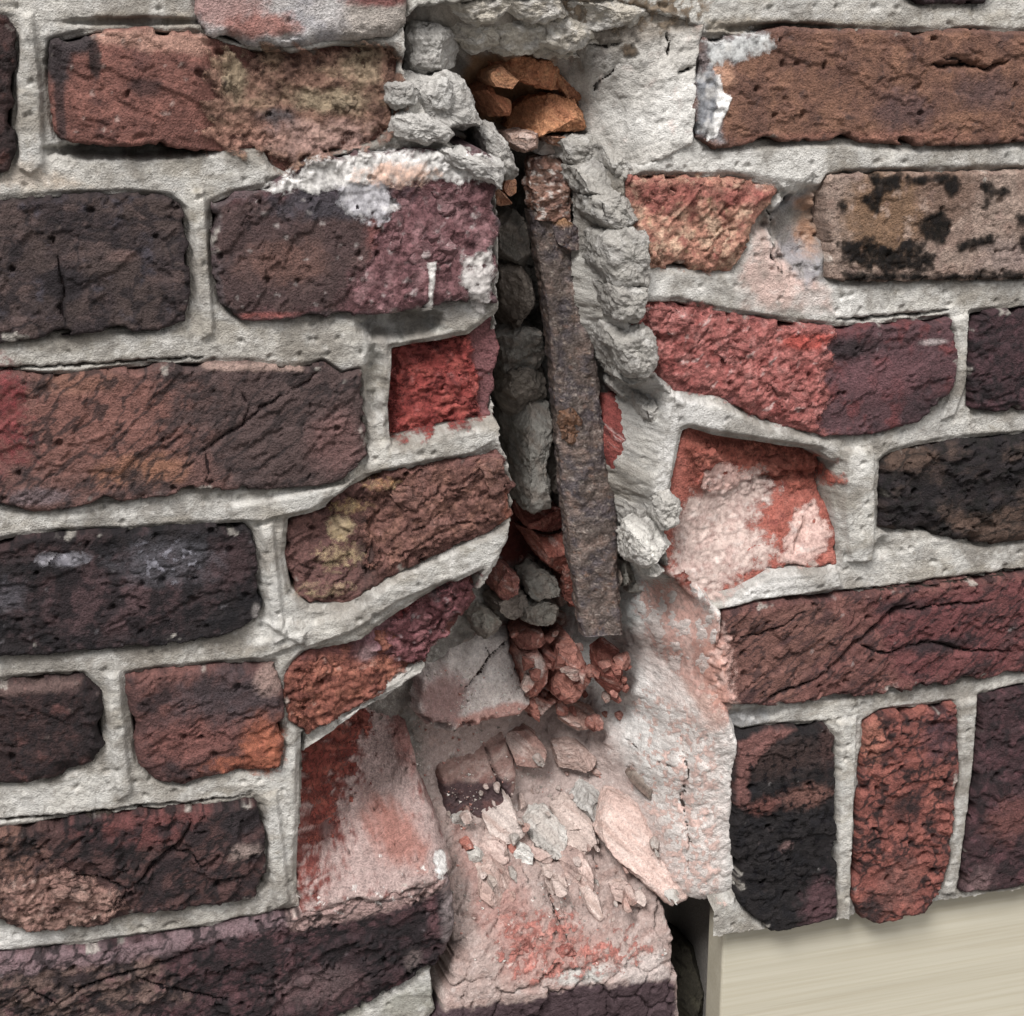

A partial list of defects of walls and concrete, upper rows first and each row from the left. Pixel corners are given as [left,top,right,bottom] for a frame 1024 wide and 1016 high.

spalling [351,182,499,313]
rust [551,218,579,251]
spalling [630,173,775,274]
spalling [388,336,486,444]
spalling [638,302,837,431]
spalling [356,457,510,575]
spalling [285,572,482,846]
crack [464,641,505,688]
spalling [625,767,652,799]
spalling [487,909,654,985]